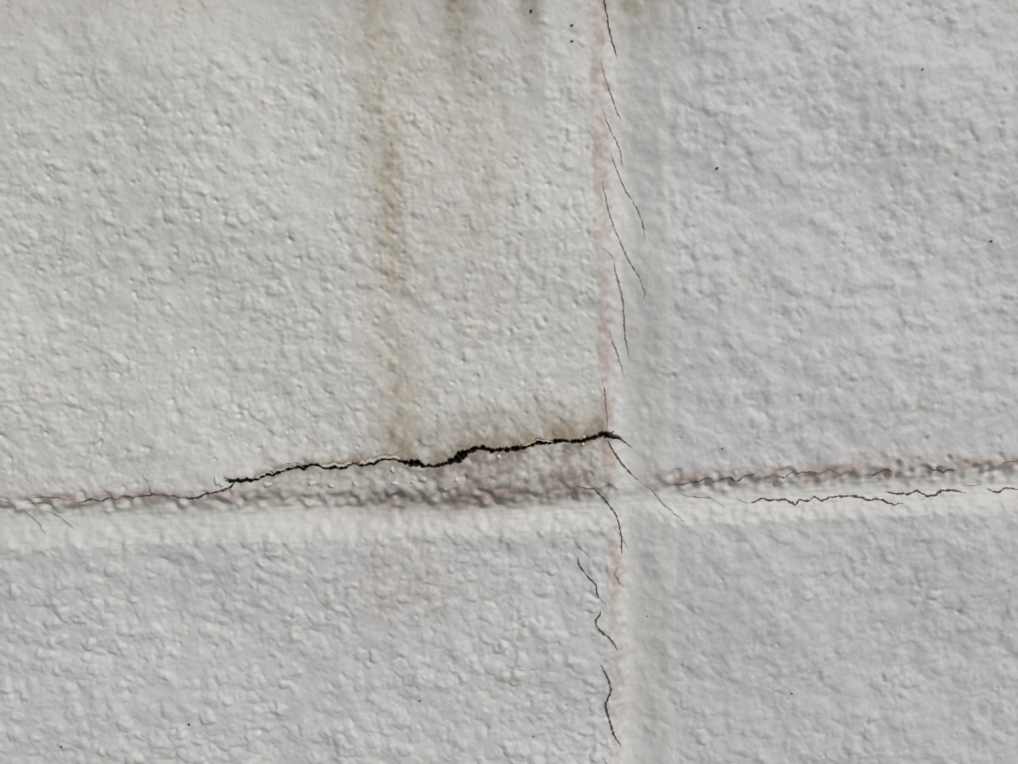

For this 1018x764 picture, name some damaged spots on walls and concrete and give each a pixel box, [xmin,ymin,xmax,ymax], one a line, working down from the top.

crack [2,0,1018,535]
crack [578,486,627,764]